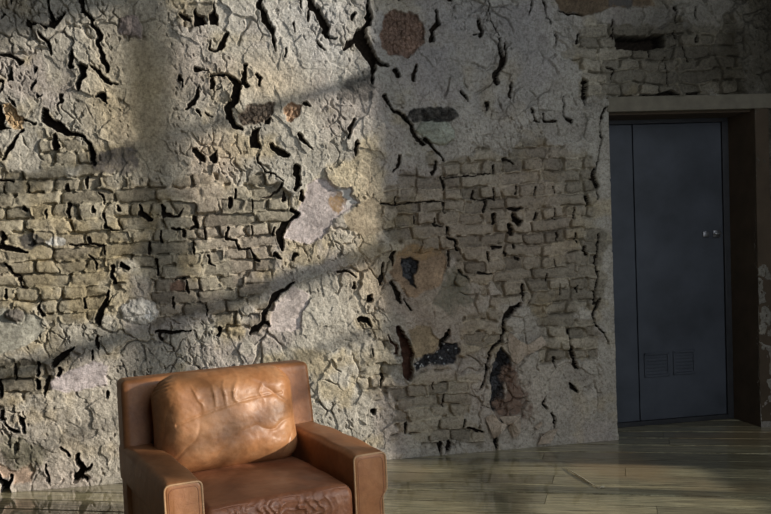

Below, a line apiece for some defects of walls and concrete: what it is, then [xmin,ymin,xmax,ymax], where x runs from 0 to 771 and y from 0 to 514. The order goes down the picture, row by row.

crack [256,0,698,342]
crack [0,0,313,433]
spalling [284,179,384,244]
spalling [401,257,418,288]
spalling [0,308,45,353]
spalling [269,286,309,332]
crack [336,251,414,387]
spalling [409,326,460,370]
crack [479,283,525,390]
flaking render [508,333,546,364]
crack [0,474,14,491]
crack [60,446,93,481]